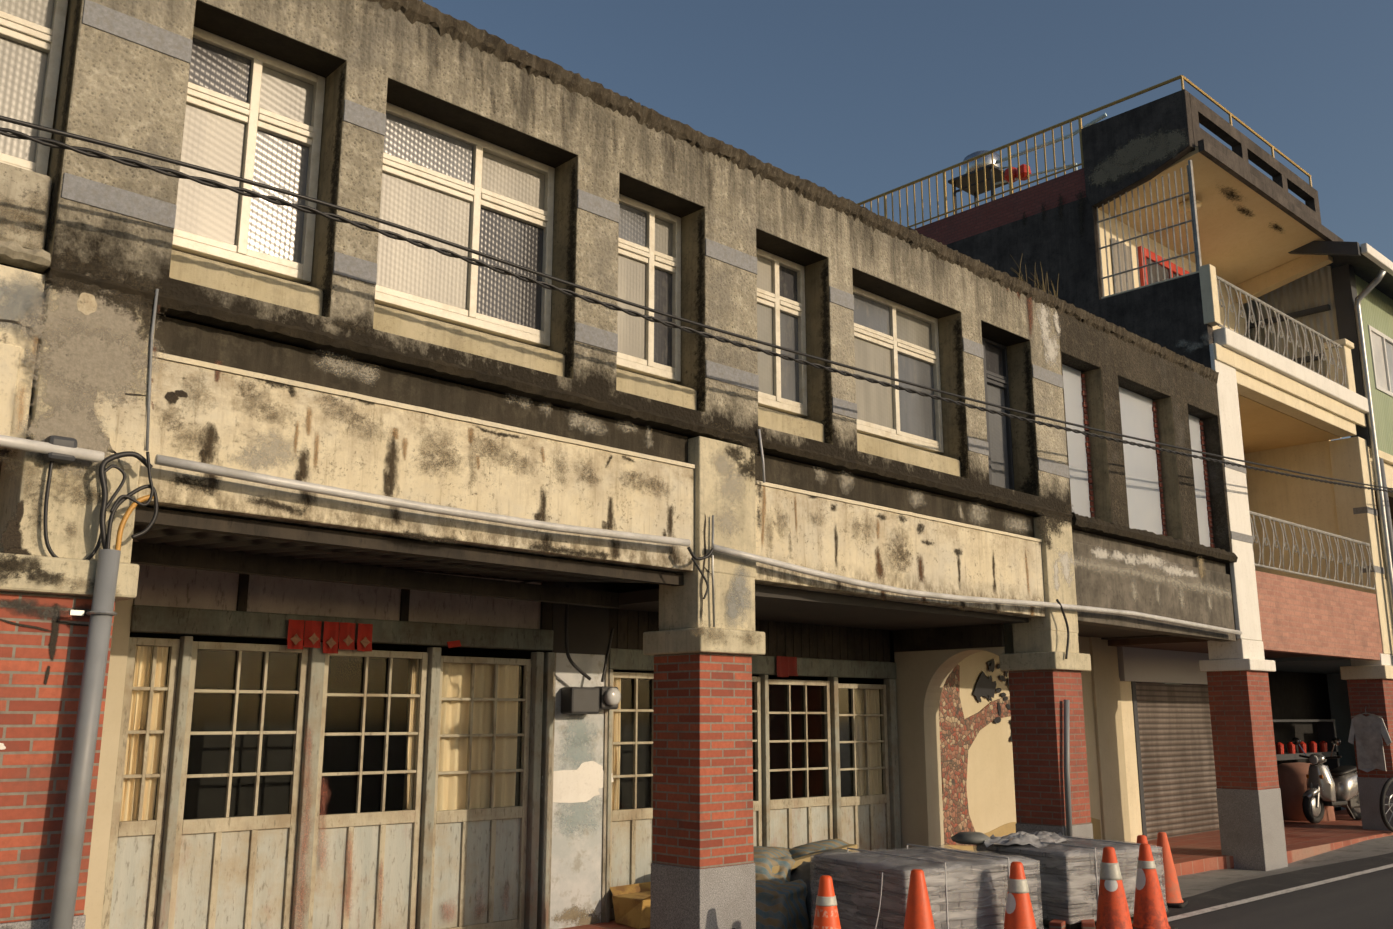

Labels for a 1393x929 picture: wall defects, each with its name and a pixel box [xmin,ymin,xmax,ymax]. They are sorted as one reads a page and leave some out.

damp [239,378,295,419]
damp [164,381,219,496]
damp [0,549,94,588]
damp [248,452,315,515]
damp [384,439,460,543]
damp [530,491,621,559]
damp [811,495,838,563]
damp [855,515,934,600]
damp [1038,502,1230,608]
damp [0,600,91,619]
peeling [542,761,613,803]
spalling [554,906,601,926]